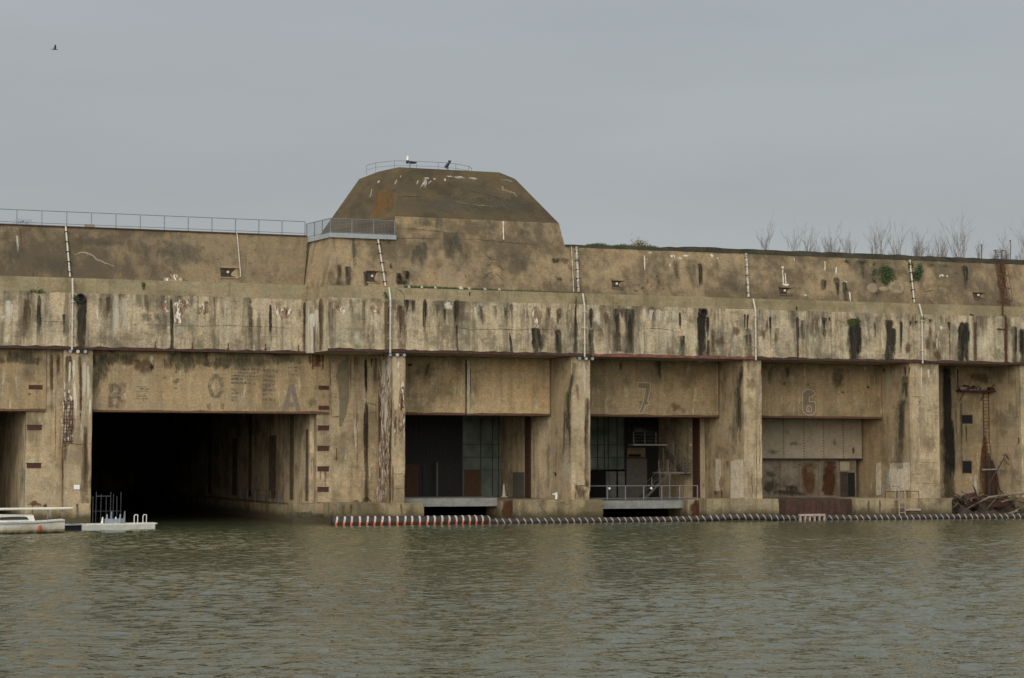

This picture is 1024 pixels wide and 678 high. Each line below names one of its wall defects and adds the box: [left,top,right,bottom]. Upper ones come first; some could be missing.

water stain [62,299,262,415]
spalling [159,299,209,324]
water stain [531,328,542,353]
water stain [614,309,685,353]
water stain [697,308,723,363]
water stain [848,320,866,370]
water stain [351,300,427,510]
water stain [883,314,977,498]
corrosion [805,462,835,495]
corrosion [980,437,988,498]